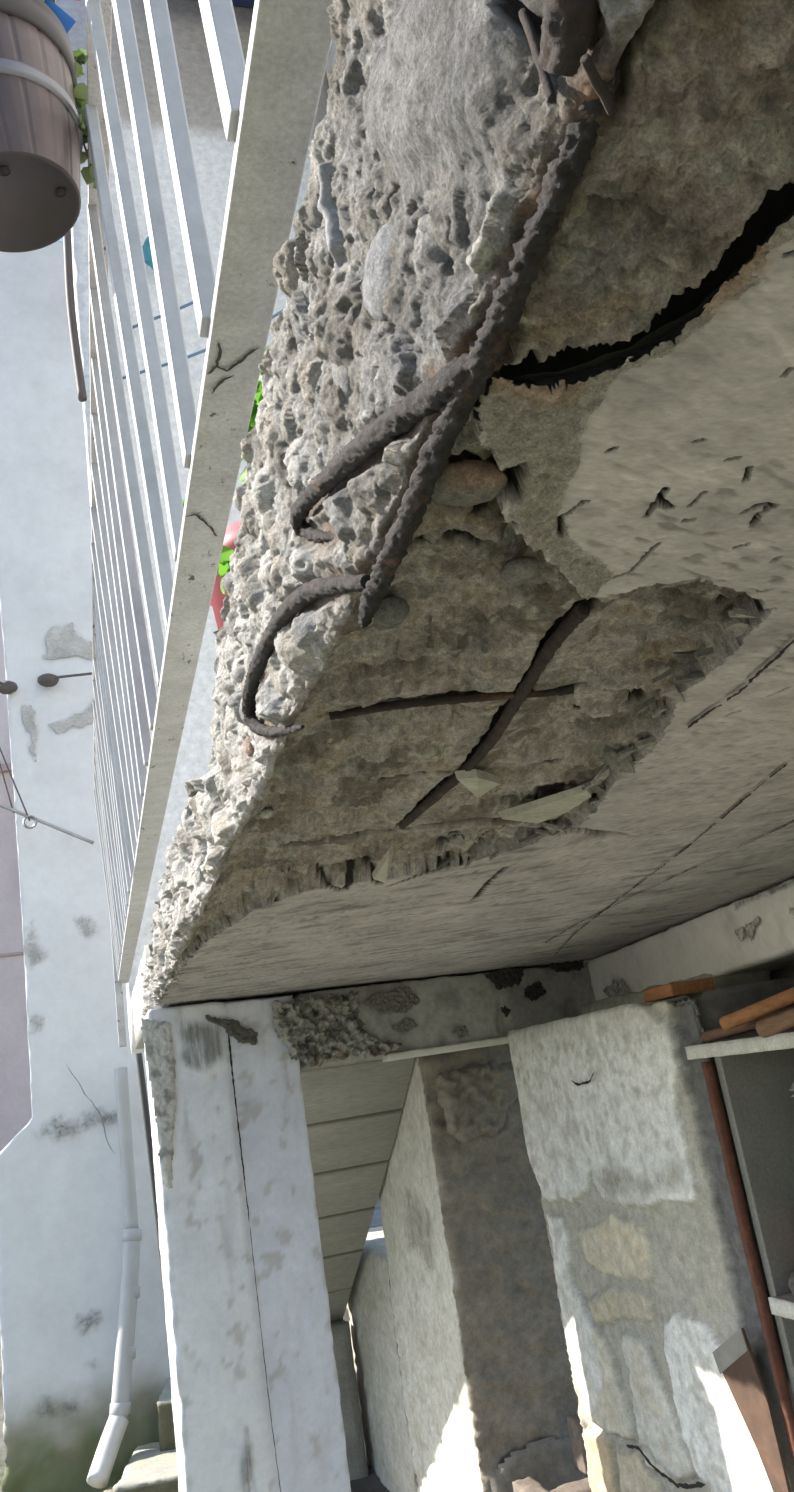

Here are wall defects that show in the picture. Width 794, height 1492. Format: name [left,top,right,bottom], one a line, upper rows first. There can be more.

corrosion [396,0,627,401]
crack [499,182,794,384]
peeling [42,623,93,659]
corrosion [257,704,308,745]
corrosion [291,411,440,617]
crack [258,542,662,901]
spalling [141,0,794,1191]
crack [687,592,794,729]
crack [545,764,794,955]
crack [626,1445,705,1489]